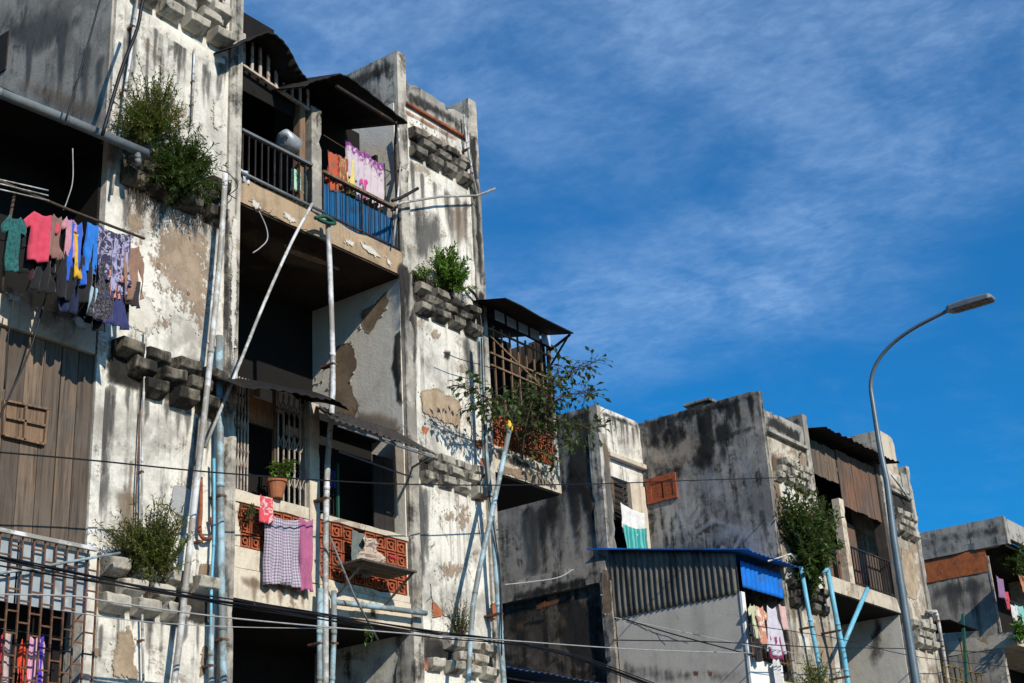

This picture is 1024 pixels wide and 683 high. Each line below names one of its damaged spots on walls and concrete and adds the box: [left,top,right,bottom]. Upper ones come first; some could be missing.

damp [10,14,69,84]
flaking render [122,201,215,343]
flaking render [344,238,392,266]
flaking render [359,291,389,333]
damp [411,137,483,275]
damp [99,355,149,532]
damp [165,389,214,489]
flaking render [314,341,359,417]
flaking render [418,384,463,435]
damp [524,409,594,573]
damp [603,394,754,535]
flaking render [91,625,140,683]